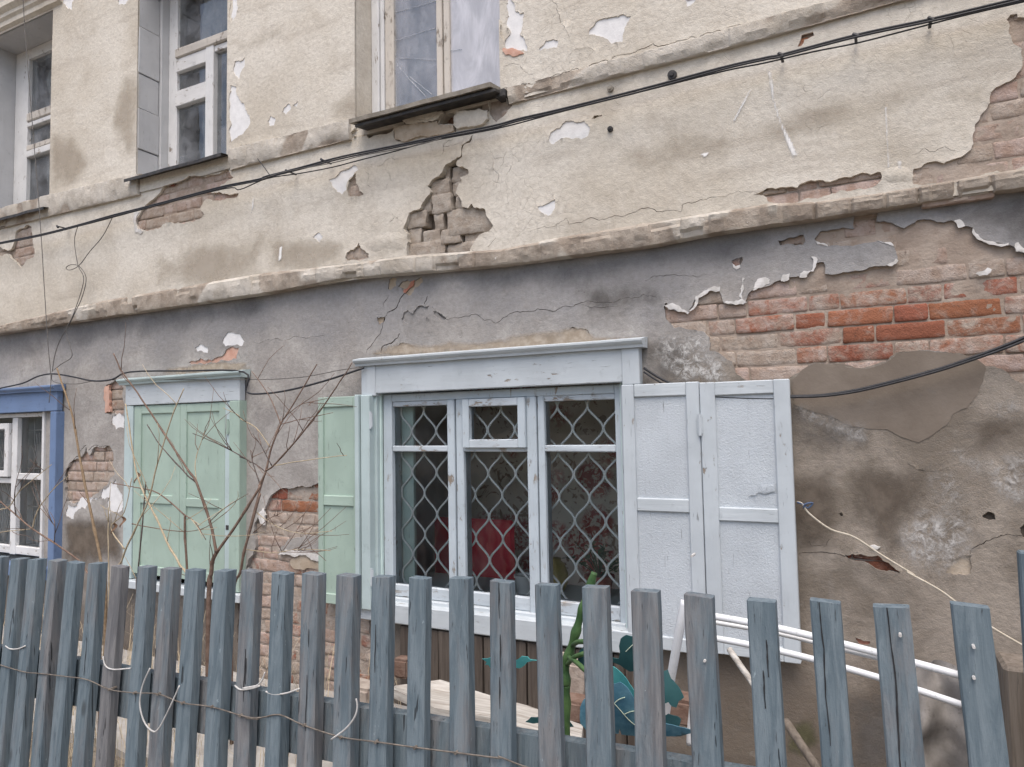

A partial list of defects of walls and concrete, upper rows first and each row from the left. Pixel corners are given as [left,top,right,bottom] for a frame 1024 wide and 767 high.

peeling [589,15,630,44]
peeling [229,59,250,142]
flaking render [912,14,1024,185]
flaking render [133,171,238,234]
peeling [330,165,363,196]
flaking render [757,173,882,203]
peeling [190,332,244,364]
crack [367,274,696,355]
flaking render [658,191,1024,383]
flaking render [66,446,123,519]
flaking render [249,484,319,684]
flaking render [846,545,899,572]